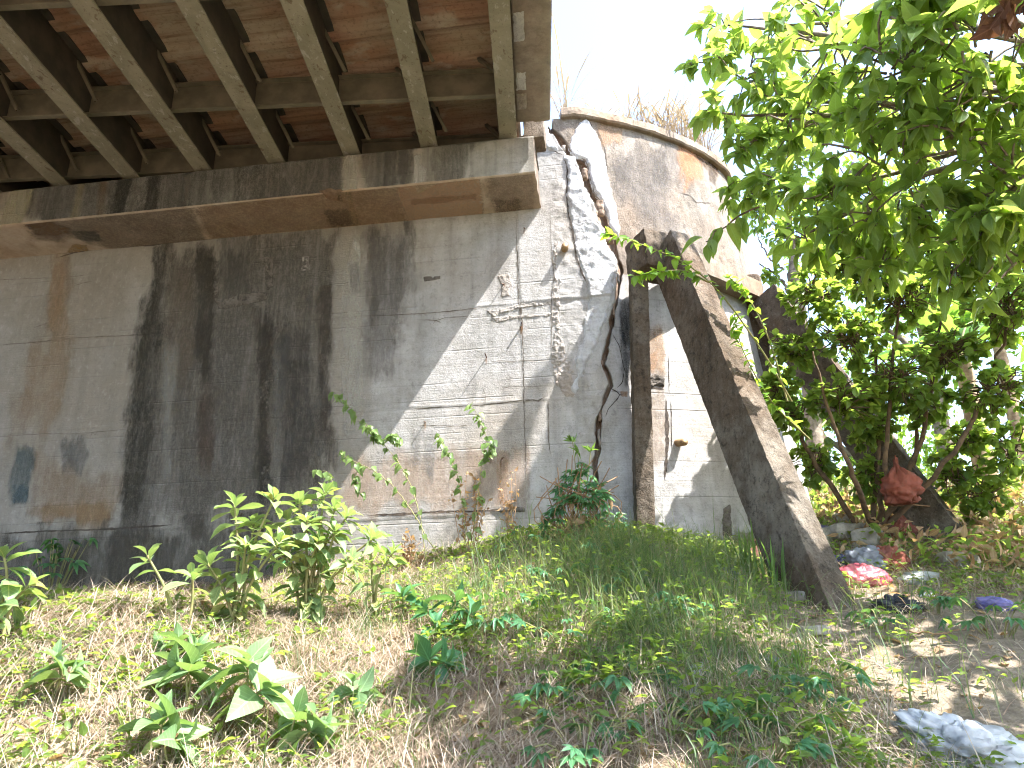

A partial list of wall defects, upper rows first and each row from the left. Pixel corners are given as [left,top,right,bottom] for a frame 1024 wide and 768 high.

leakage [0,143,474,590]
crack [413,120,625,519]
flaking render [487,119,620,397]